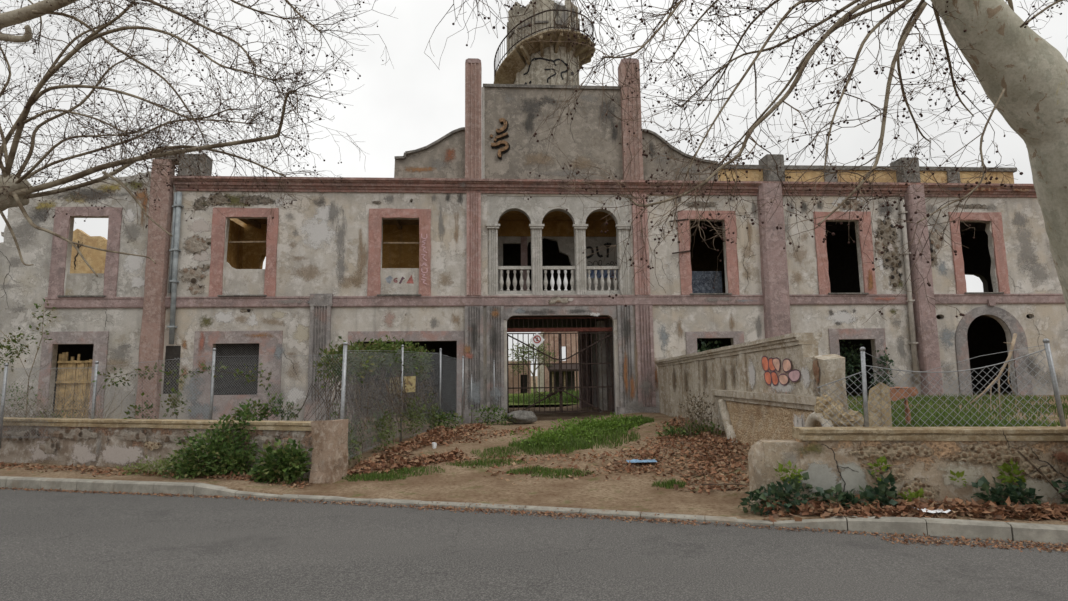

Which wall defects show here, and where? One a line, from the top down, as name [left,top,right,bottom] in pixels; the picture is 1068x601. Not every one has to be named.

spalling [179,192,282,295]
damp [316,199,345,279]
spalling [832,196,903,291]
damp [1014,212,1047,282]
spalling [4,428,189,466]
spalling [845,442,1068,502]